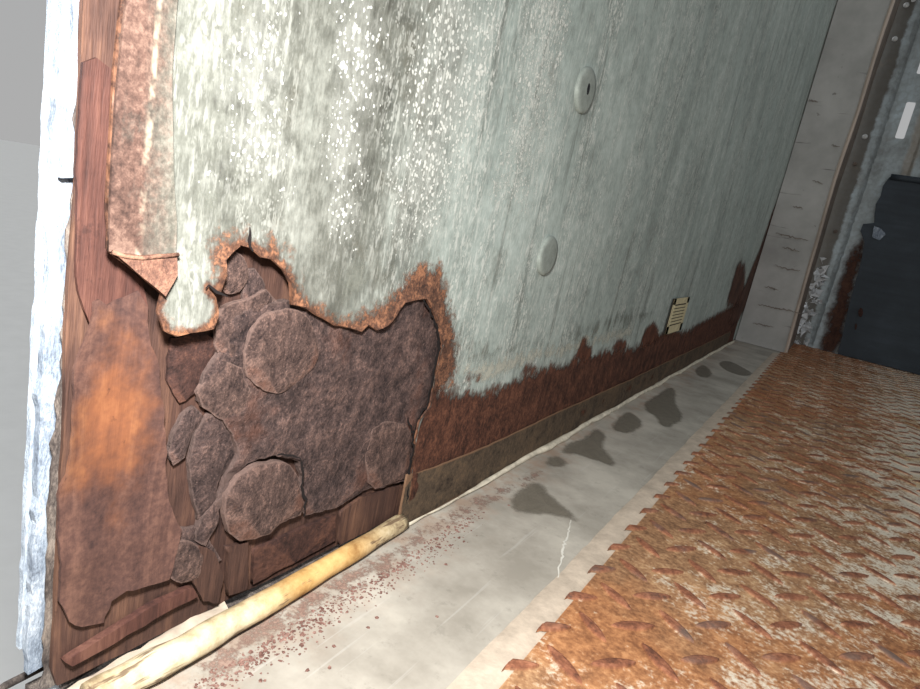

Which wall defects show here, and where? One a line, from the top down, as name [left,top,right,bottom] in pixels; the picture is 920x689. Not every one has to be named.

water stain [720,361,750,376]
corrosion [165,206,775,583]
water stain [613,413,641,433]
water stain [646,388,681,426]
water stain [548,430,614,466]
water stain [513,484,572,518]
corrosion [198,530,426,689]